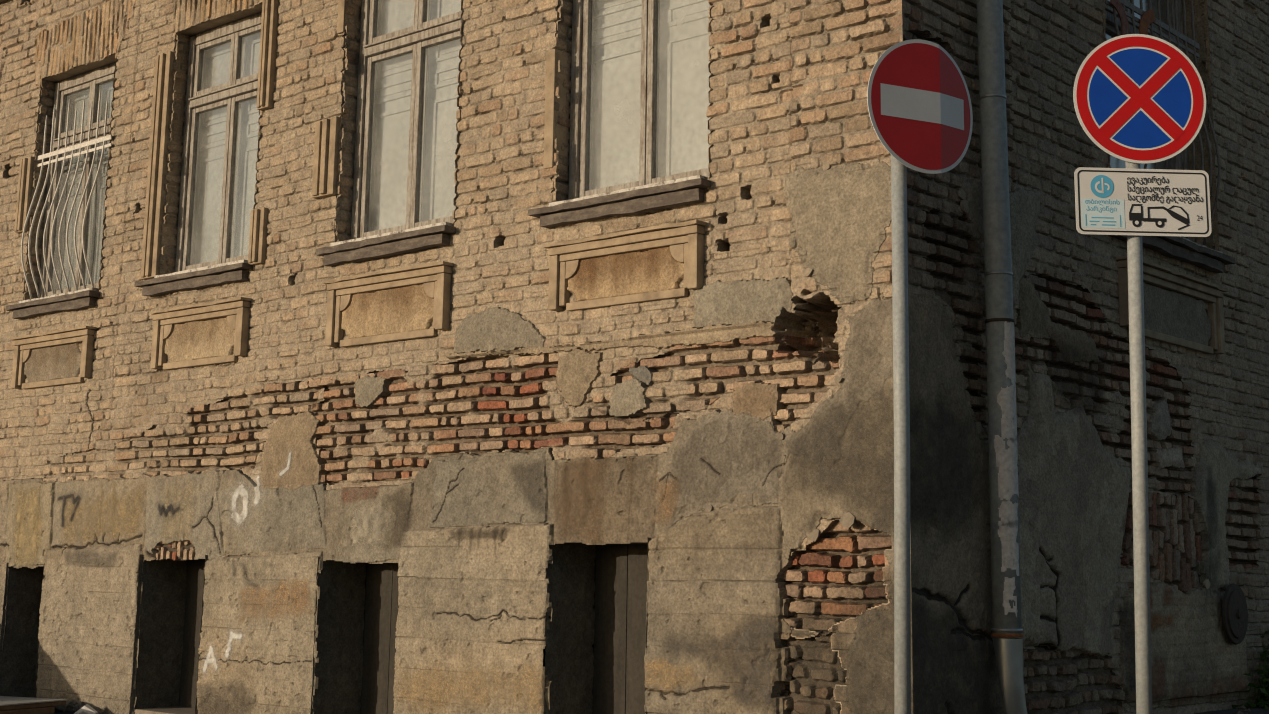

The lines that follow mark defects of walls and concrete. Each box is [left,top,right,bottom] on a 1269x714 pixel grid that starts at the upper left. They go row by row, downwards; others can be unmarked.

spalling [903,29,952,50]
crack [86,389,95,449]
spalling [42,277,849,529]
peeling [908,174,1136,714]
crack [433,468,465,522]
spalling [153,540,196,560]
crack [192,498,221,555]
peeling [1145,347,1263,706]
crack [437,610,550,644]
spalling [778,520,892,714]
crack [912,585,993,642]
crack [1034,547,1060,650]